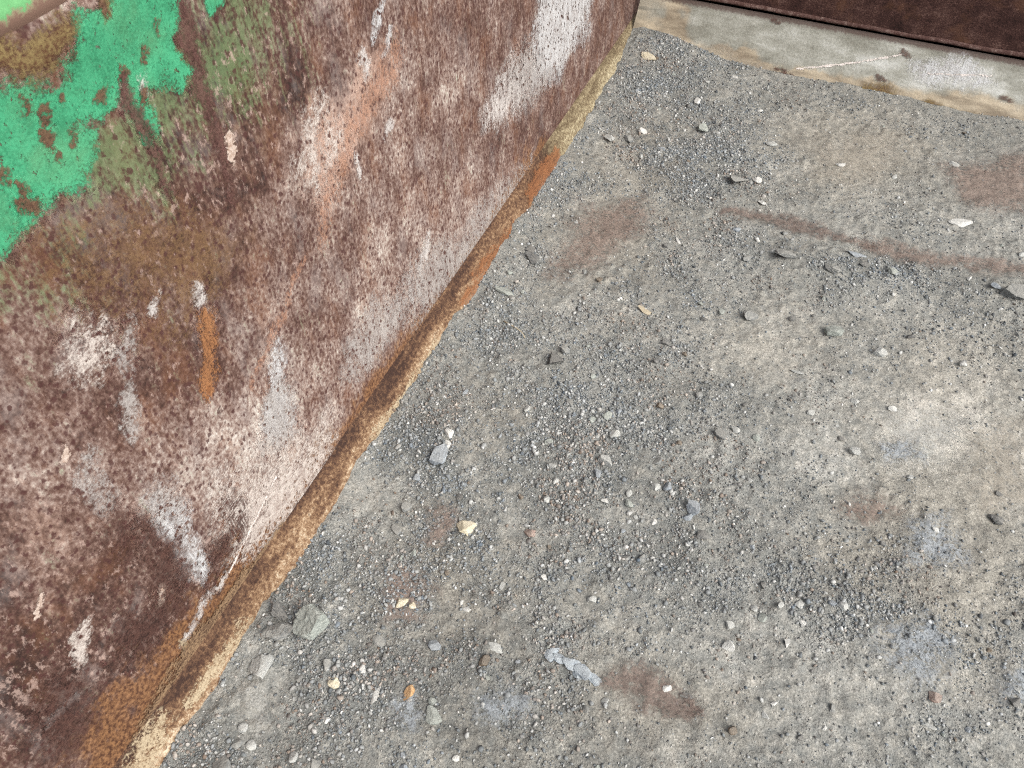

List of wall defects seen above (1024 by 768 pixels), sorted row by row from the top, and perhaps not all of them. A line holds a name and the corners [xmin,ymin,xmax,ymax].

rust [99,0,111,19]
peeling [205,0,224,16]
rust [0,166,40,216]
rust [0,12,78,161]
peeling [0,0,192,259]
rust [92,88,107,105]
rust [526,147,560,205]
rust [197,308,219,403]
rust [102,497,190,669]
rust [129,521,284,747]
rust [202,487,250,590]
rust [20,660,103,767]